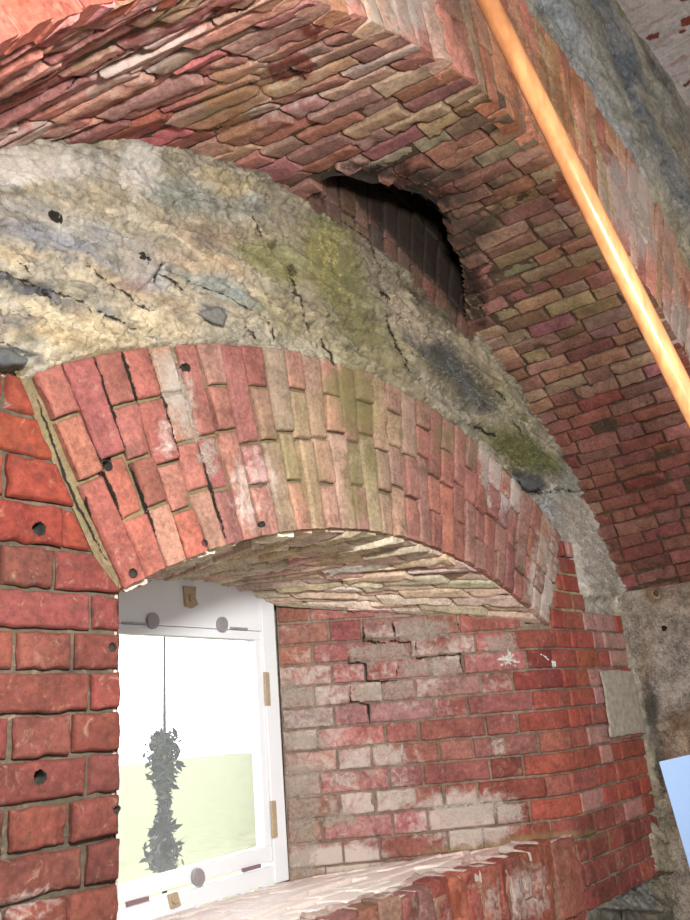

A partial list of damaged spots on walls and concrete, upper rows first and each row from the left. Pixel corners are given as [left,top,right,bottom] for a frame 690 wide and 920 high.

crack [0,261,154,330]
crack [286,264,334,364]